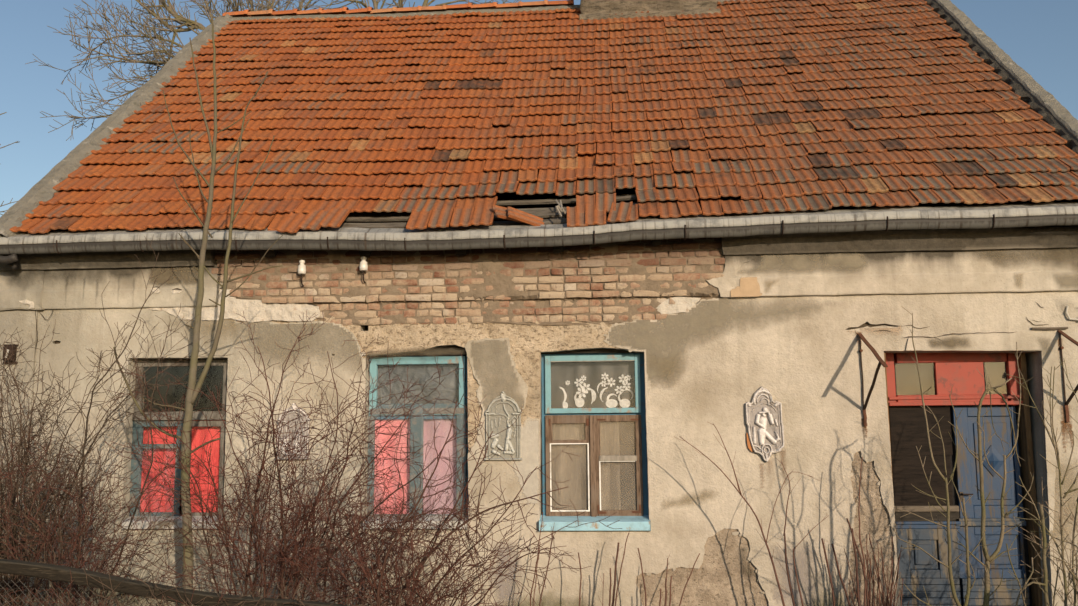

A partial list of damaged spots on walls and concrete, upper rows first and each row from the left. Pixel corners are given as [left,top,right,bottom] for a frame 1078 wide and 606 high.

flaking render [211,237,725,453]
crack [845,303,1049,340]
rust [1061,408,1073,447]
spalling [636,528,768,606]
spalling [847,451,894,606]